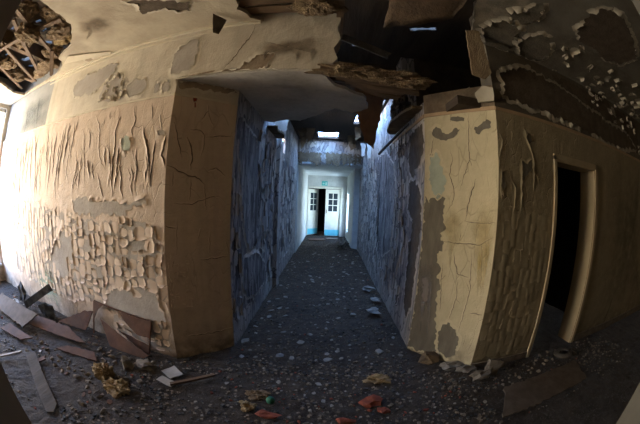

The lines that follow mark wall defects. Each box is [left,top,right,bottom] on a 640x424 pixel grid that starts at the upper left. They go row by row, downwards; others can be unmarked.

peeling [72,36,278,103]
peeling [472,2,640,155]
peeling [12,191,193,351]
peeling [359,113,467,361]
crack [438,250,483,331]
peeling [499,168,509,197]
peeling [475,209,553,360]